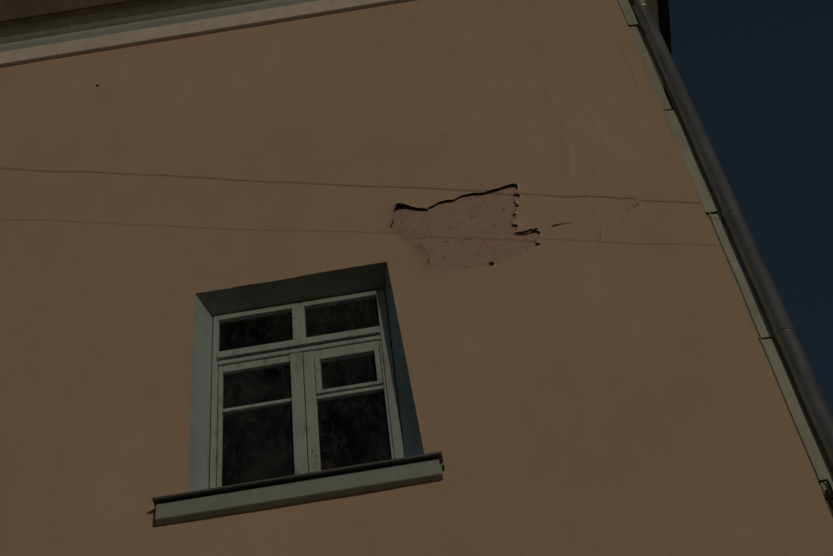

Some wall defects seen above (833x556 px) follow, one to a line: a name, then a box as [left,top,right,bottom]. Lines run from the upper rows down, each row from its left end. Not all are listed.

peeling [376,179,552,280]